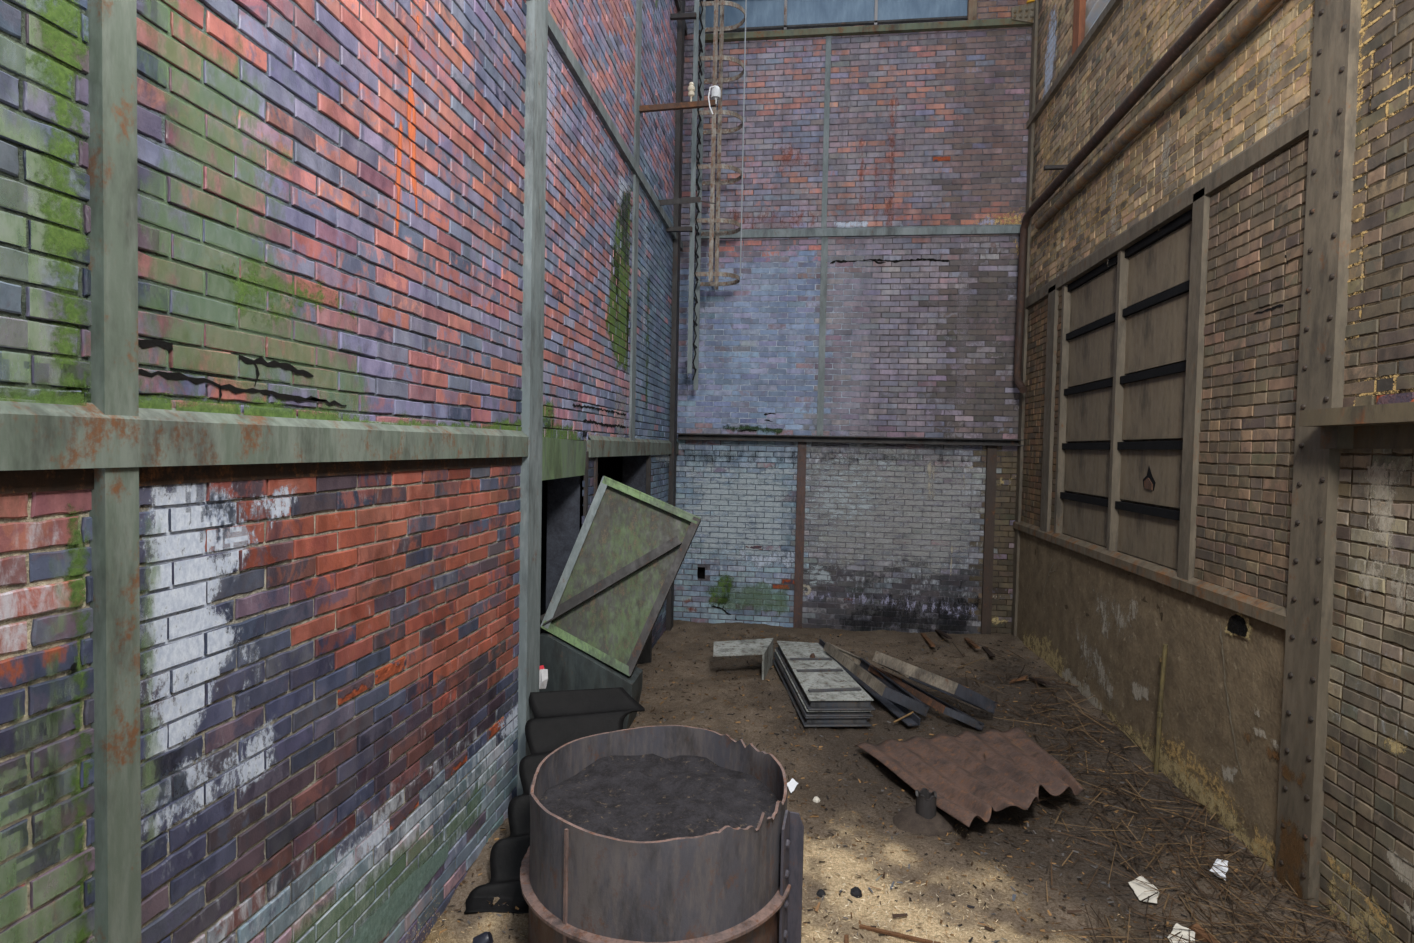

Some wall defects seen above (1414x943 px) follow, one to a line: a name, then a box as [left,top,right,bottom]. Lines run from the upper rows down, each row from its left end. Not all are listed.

damp [613,175,650,408]
damp [140,483,297,844]